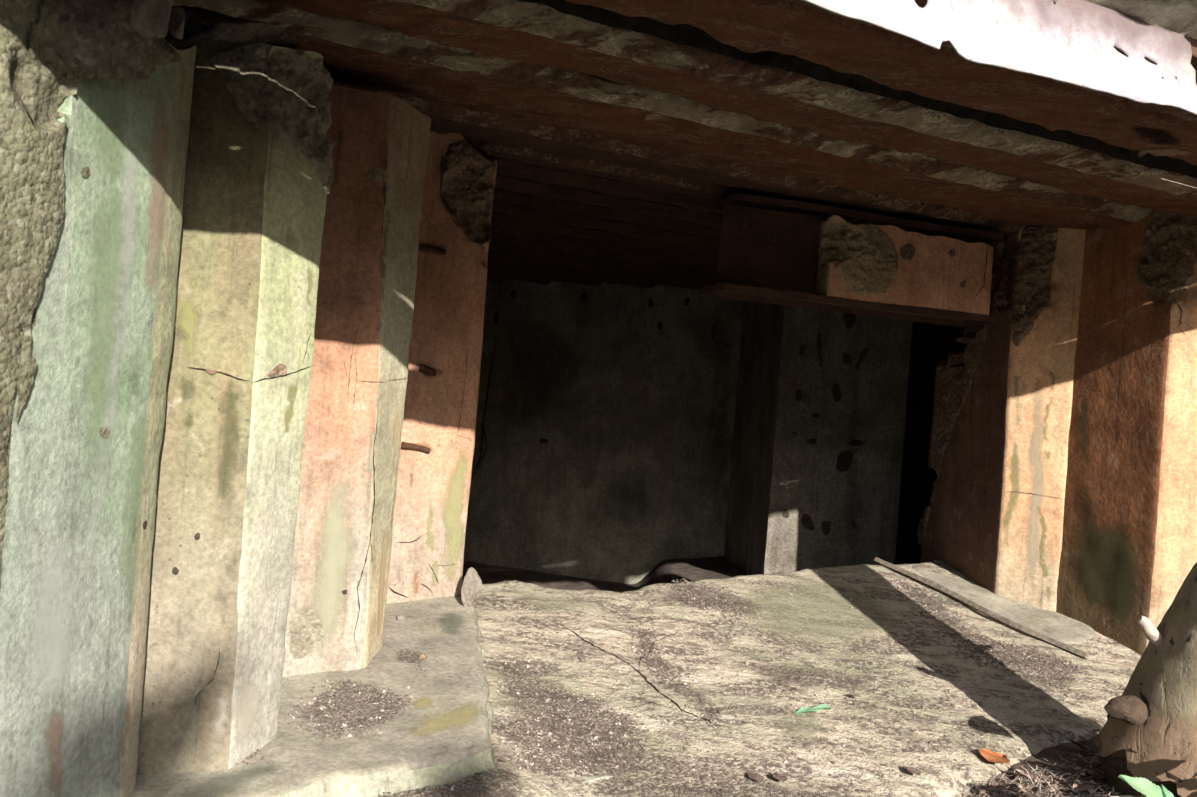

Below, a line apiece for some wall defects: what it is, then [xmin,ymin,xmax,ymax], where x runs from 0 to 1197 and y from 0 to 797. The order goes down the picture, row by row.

spalling [152,5,334,194]
spalling [0,0,80,461]
spalling [442,139,496,253]
spalling [823,218,915,295]
spalling [1137,210,1197,305]
crack [189,334,311,382]
spalling [267,364,287,377]
corrosion [414,364,441,376]
spalling [917,225,1058,548]
crack [344,291,454,649]
corrosion [401,442,431,454]